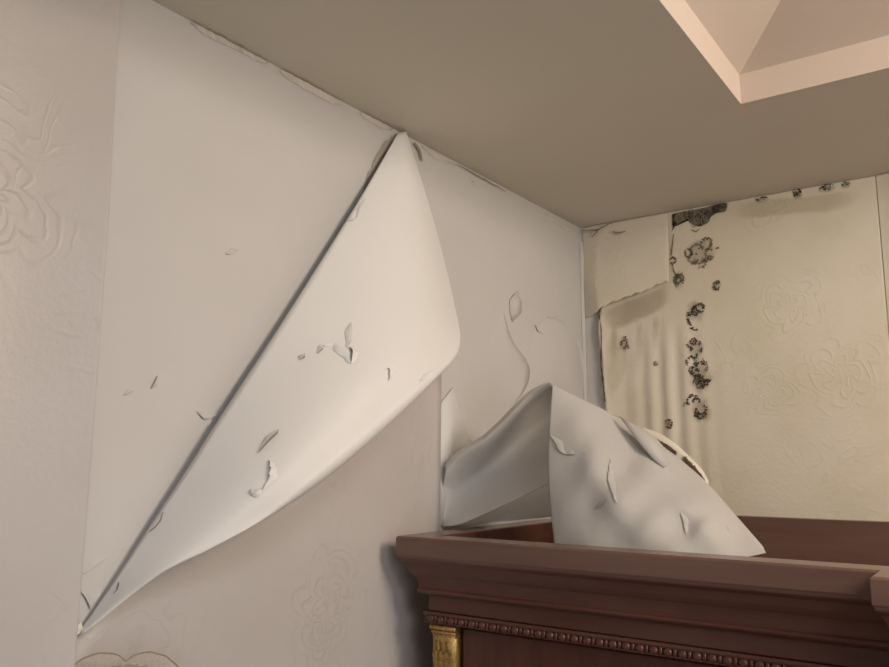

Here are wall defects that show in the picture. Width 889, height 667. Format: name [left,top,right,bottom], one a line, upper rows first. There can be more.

peeling [75,132,460,667]
peeling [583,213,669,318]
water stain [598,176,889,521]